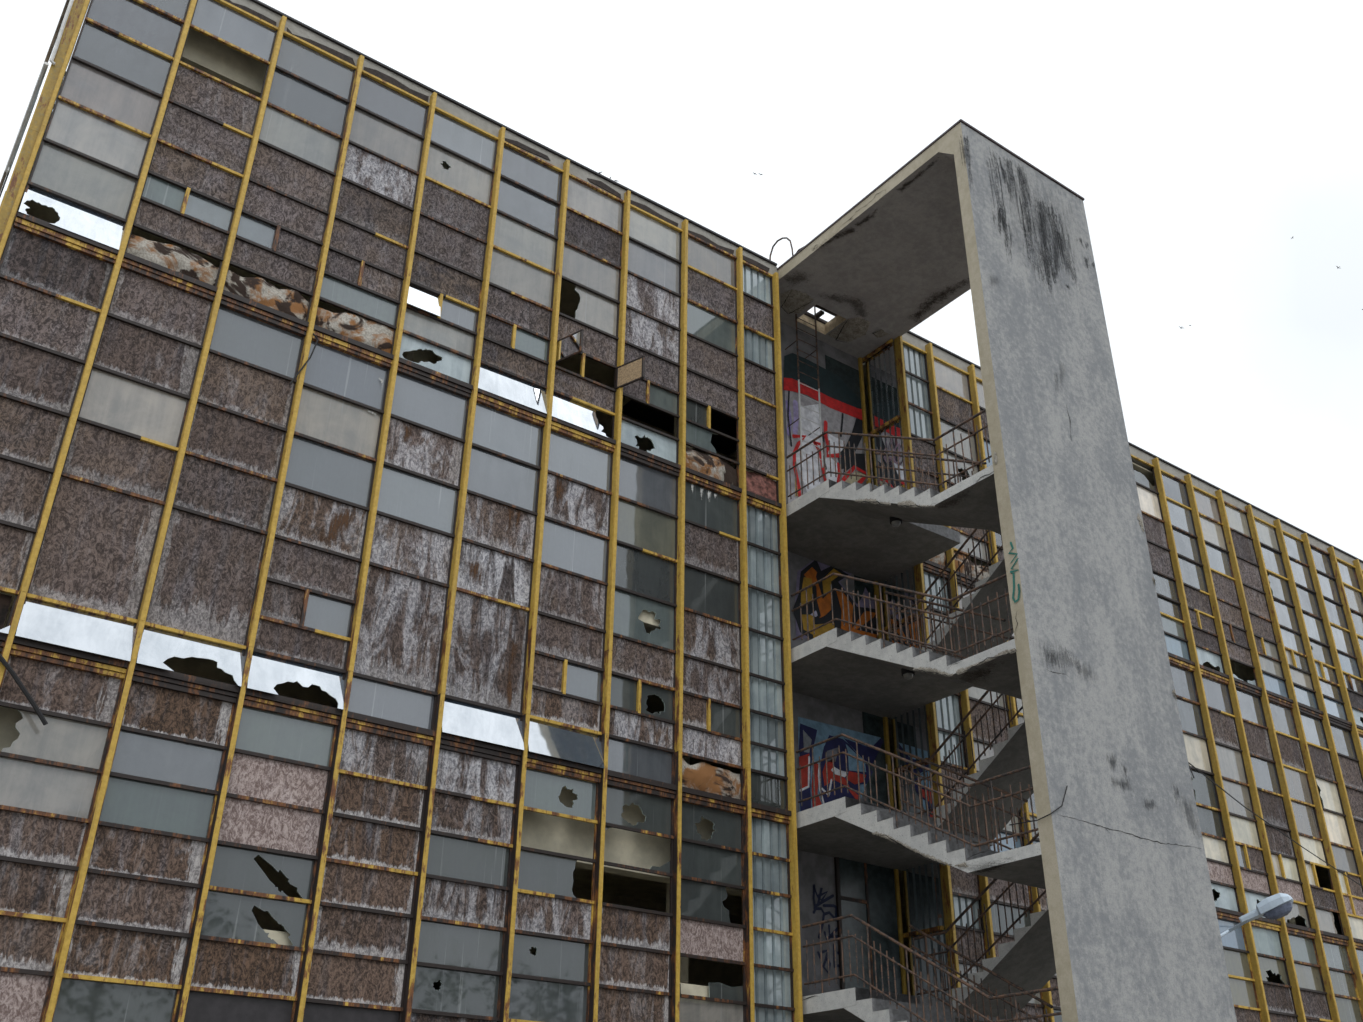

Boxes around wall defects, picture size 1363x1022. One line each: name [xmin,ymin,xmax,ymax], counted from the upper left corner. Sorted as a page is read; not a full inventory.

water stain [991,155,1088,288]
rust [556,478,564,502]
rust [464,562,483,585]